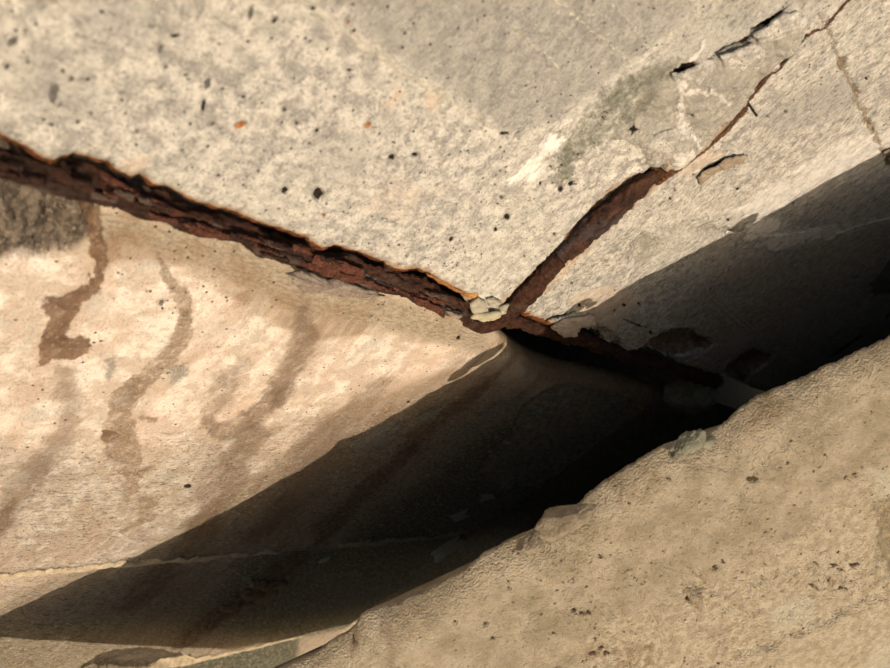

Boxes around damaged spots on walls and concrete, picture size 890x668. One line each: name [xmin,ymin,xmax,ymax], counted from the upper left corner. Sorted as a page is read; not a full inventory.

crack [644,0,851,186]
rust [101,252,192,533]
damp [120,311,316,610]
rust [0,134,479,366]
crack [545,312,572,321]
rust [505,312,724,390]
spalling [645,328,711,355]
peeling [81,647,196,668]